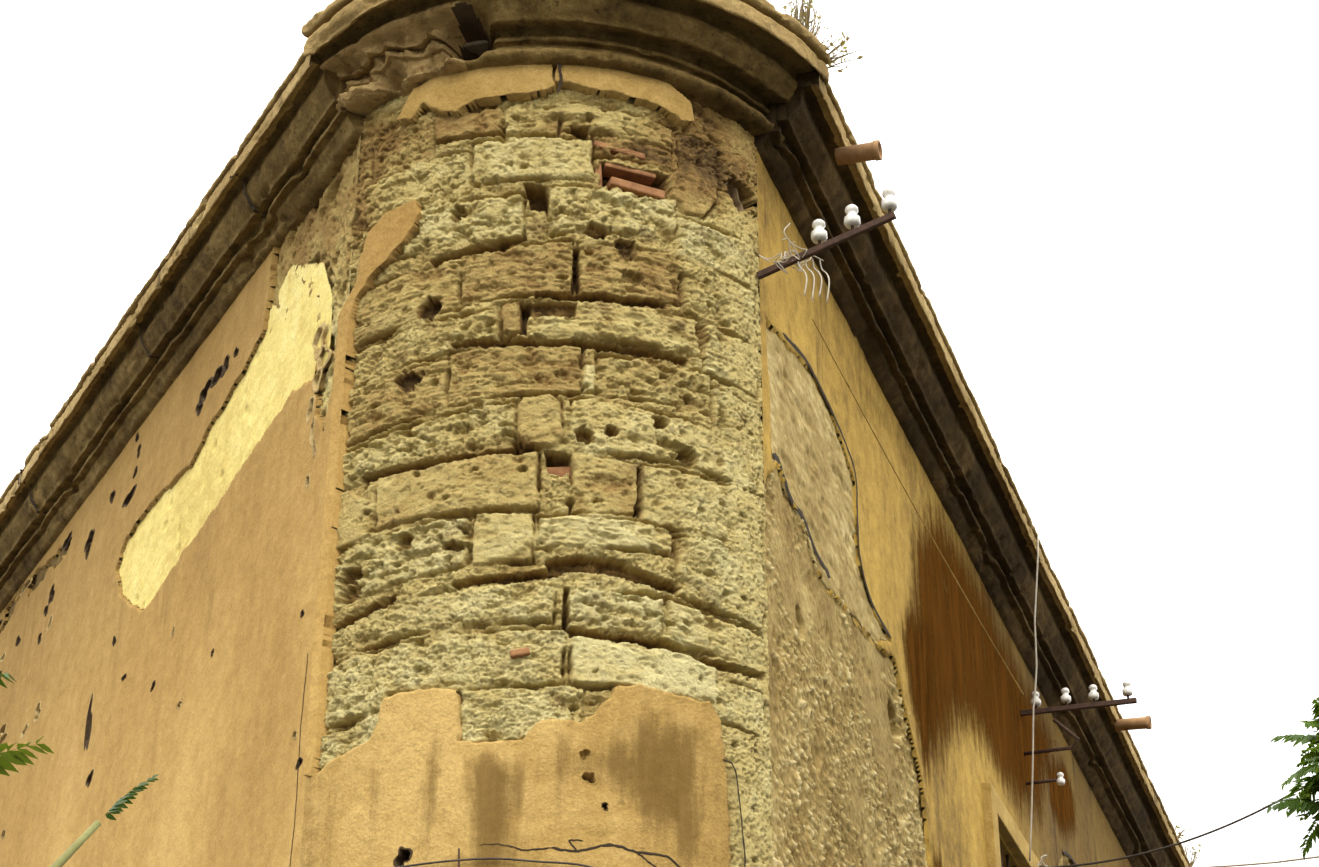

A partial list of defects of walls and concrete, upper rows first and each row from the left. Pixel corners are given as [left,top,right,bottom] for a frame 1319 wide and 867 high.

spalling [110,432,141,508]
spalling [118,64,928,867]
peeling [0,529,95,679]
damp [903,506,1075,834]
spalling [0,701,42,752]
spalling [84,693,93,751]
spalling [1058,851,1078,867]